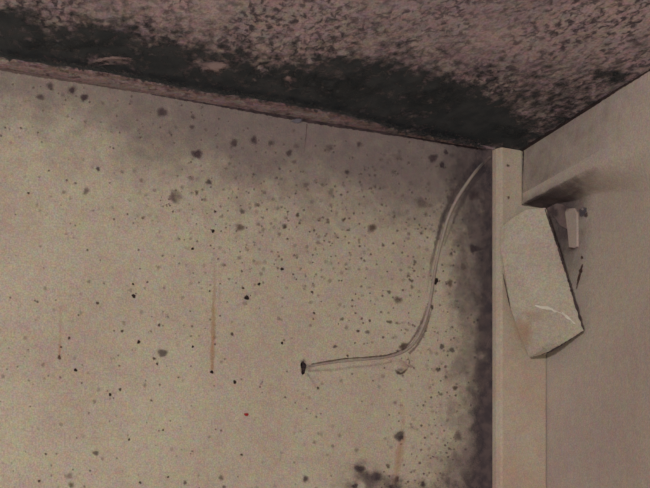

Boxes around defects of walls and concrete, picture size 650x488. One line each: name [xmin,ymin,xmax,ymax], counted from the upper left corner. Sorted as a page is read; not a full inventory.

leakage [352,465,400,488]